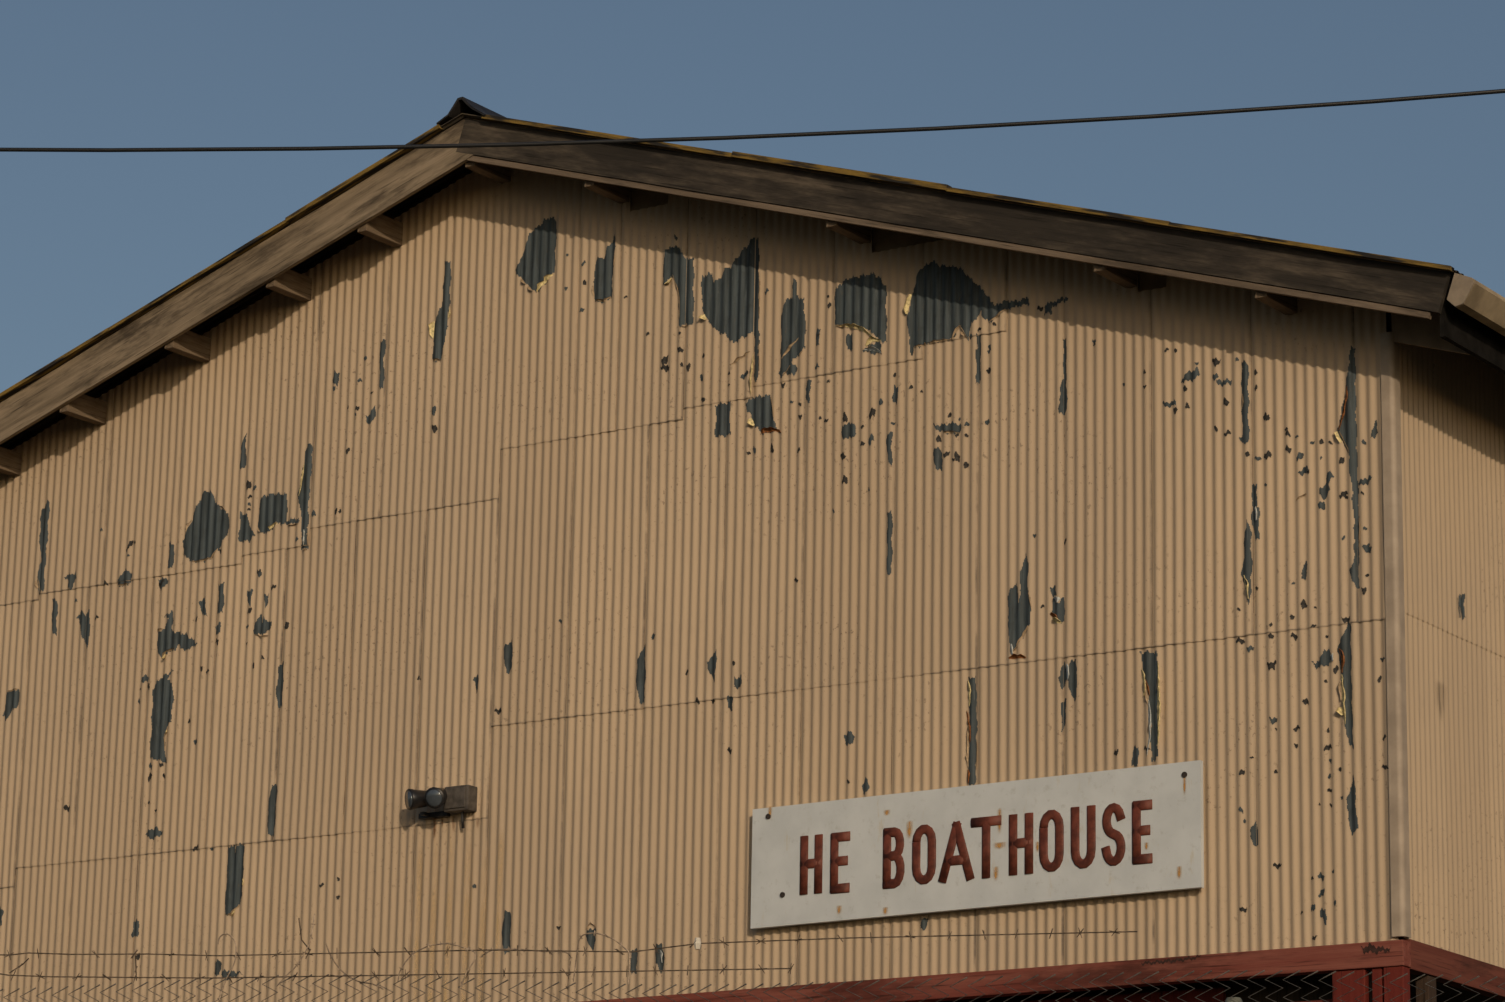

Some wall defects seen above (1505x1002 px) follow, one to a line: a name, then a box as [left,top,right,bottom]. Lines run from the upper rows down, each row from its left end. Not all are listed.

peeling [428,261,452,362]
peeling [516,217,627,312]
peeling [660,234,1068,484]
peeling [35,500,99,648]
peeling [138,582,225,782]
peeling [158,433,316,590]
peeling [246,569,289,708]
peeling [1008,556,1065,659]
peeling [1058,659,1077,732]
peeling [1114,650,1161,767]
peeling [1236,561,1359,836]
peeling [192,843,245,916]